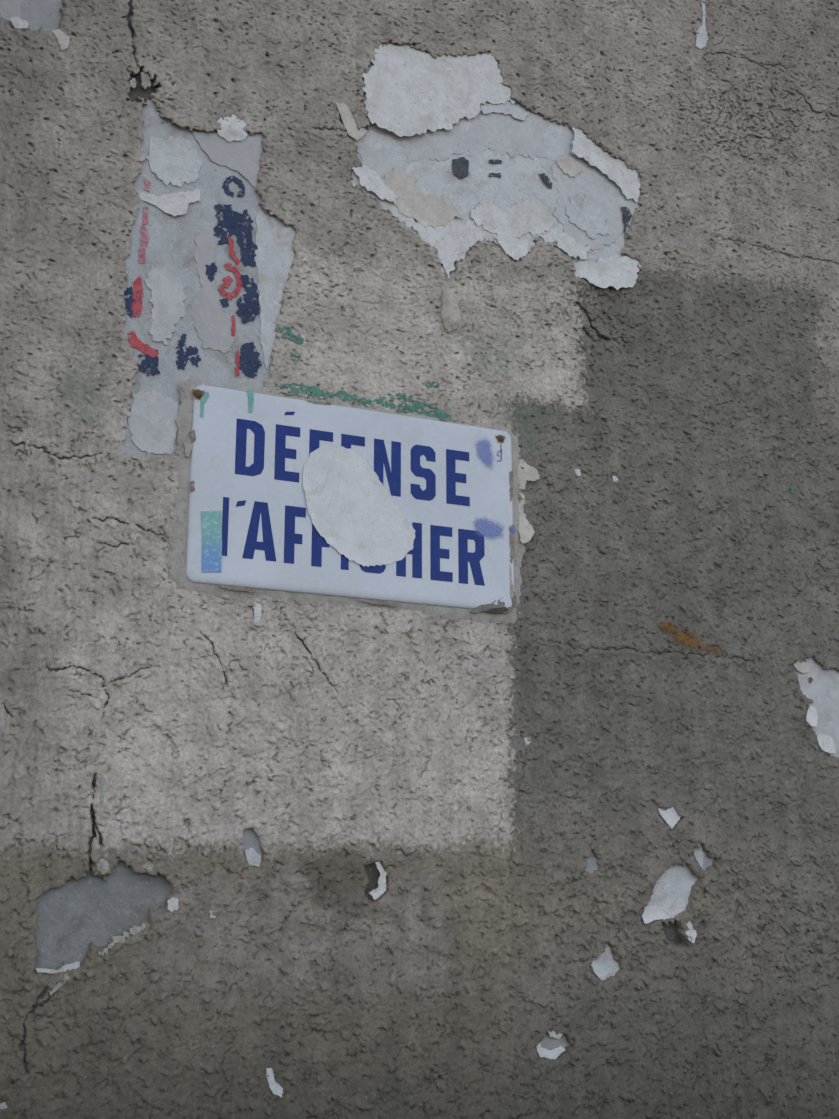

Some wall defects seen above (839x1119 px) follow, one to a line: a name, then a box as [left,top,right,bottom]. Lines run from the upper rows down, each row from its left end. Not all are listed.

peeling [0,0,70,50]
crack [127,0,138,66]
peeling [336,41,641,291]
peeling [518,459,540,543]
rust [660,622,721,654]
peeling [790,657,839,758]
crack [88,773,102,867]
spalling [34,858,179,995]
spalling [590,943,620,981]
peeling [641,846,714,944]
crack [19,987,54,1072]
spalling [536,1029,570,1059]